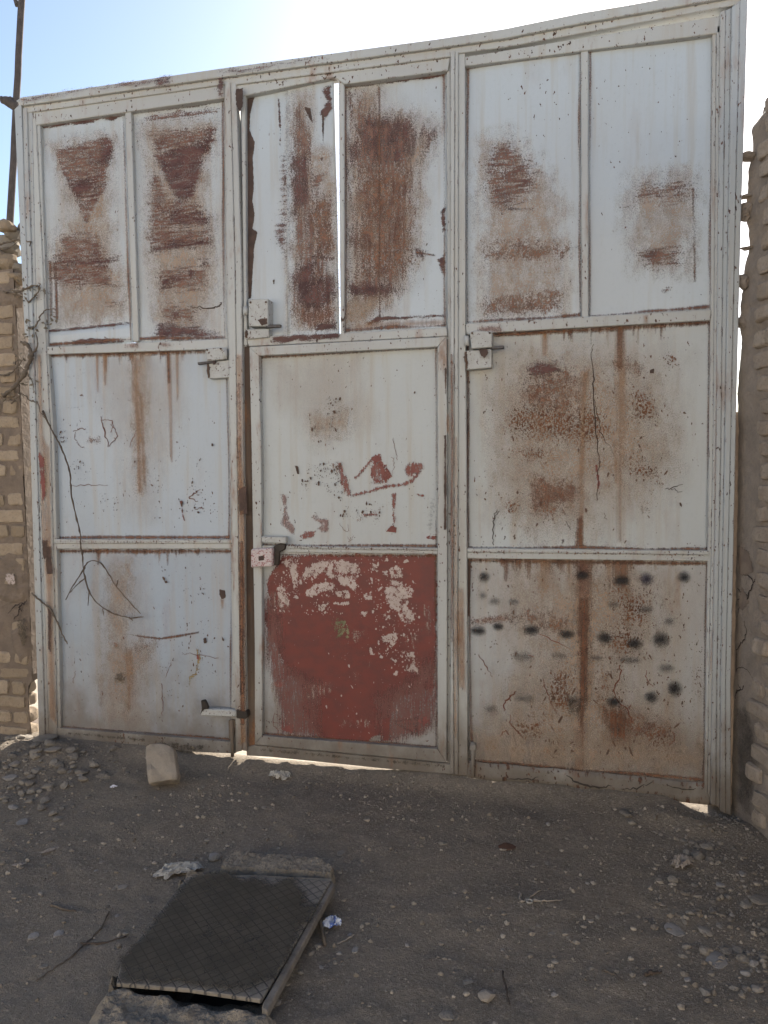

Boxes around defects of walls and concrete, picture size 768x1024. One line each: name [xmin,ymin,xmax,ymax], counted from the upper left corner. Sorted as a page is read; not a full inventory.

rust [43,101,224,444]
rust [261,74,446,381]
rust [46,379,248,725]
rust [264,528,437,625]
peeling [269,555,434,694]
rust [467,141,710,781]